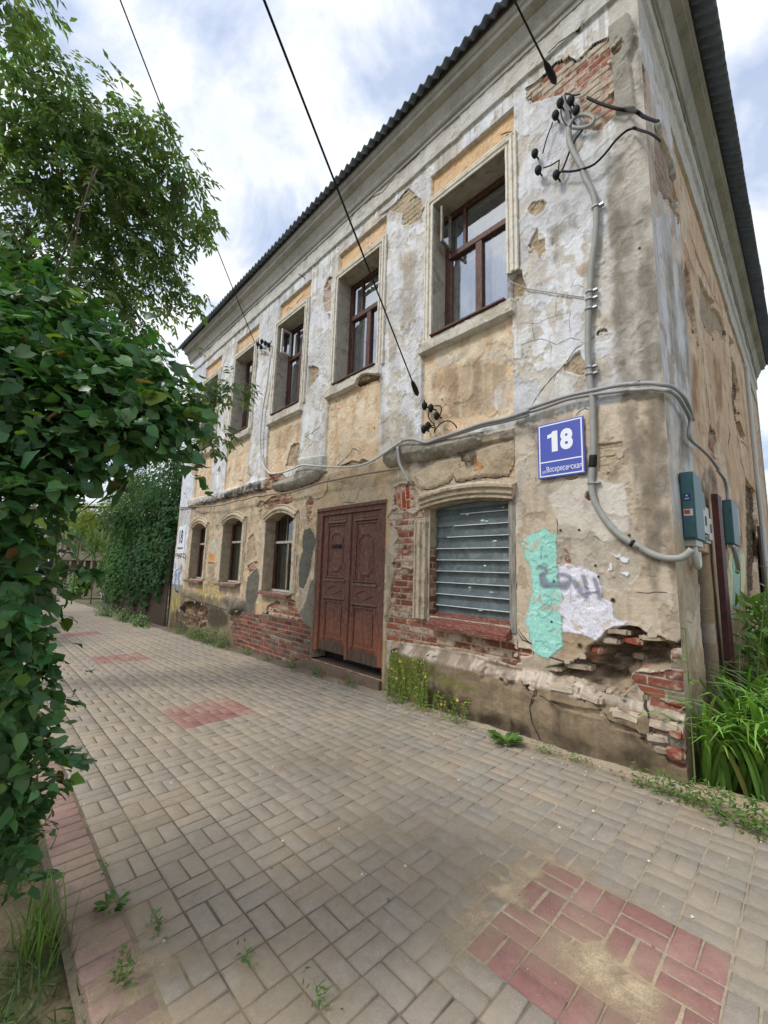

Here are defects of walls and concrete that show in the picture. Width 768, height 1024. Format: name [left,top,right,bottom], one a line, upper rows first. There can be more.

spalling [525,39,623,131]
spalling [383,190,425,225]
spalling [528,199,547,216]
spalling [527,230,546,259]
spalling [385,484,532,666]
spalling [179,601,209,628]
spalling [230,599,310,662]
crack [529,695,555,740]
spalling [528,626,688,768]